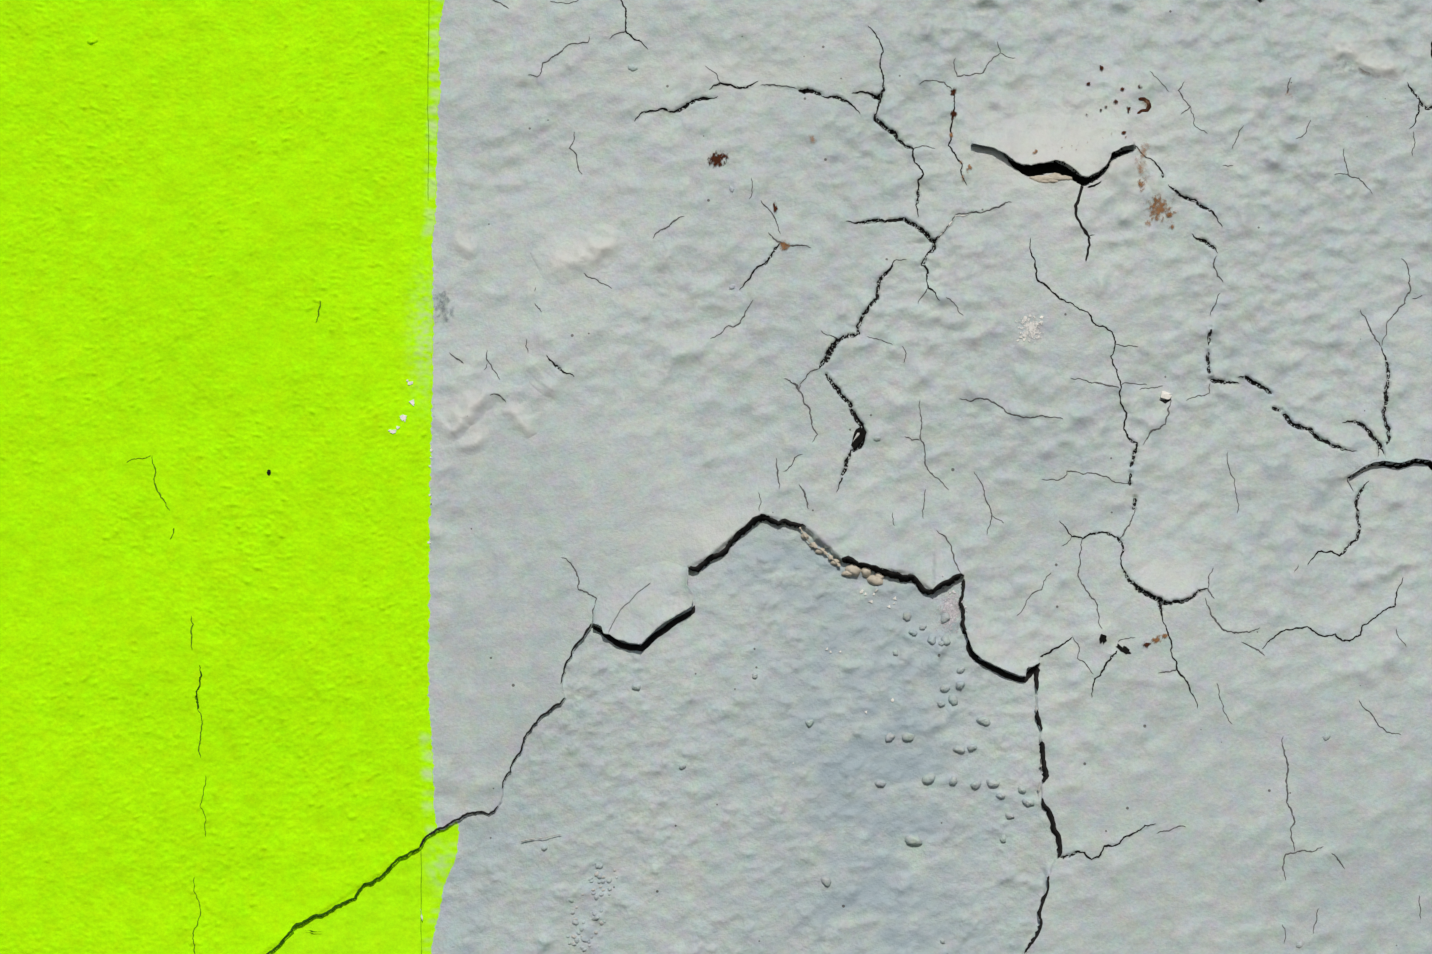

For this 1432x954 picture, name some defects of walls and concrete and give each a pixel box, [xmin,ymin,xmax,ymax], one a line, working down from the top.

crack [529,0,648,77]
peeling [971,107,1136,261]
crack [1150,71,1244,166]
crack [1407,82,1432,156]
crack [635,26,1011,509]
crack [892,401,1003,573]
crack [962,398,1063,419]
crack [1018,145,1422,724]
crack [561,557,597,622]
spalling [266,514,1062,954]
crack [1060,824,1185,860]
crack [1281,737,1345,880]